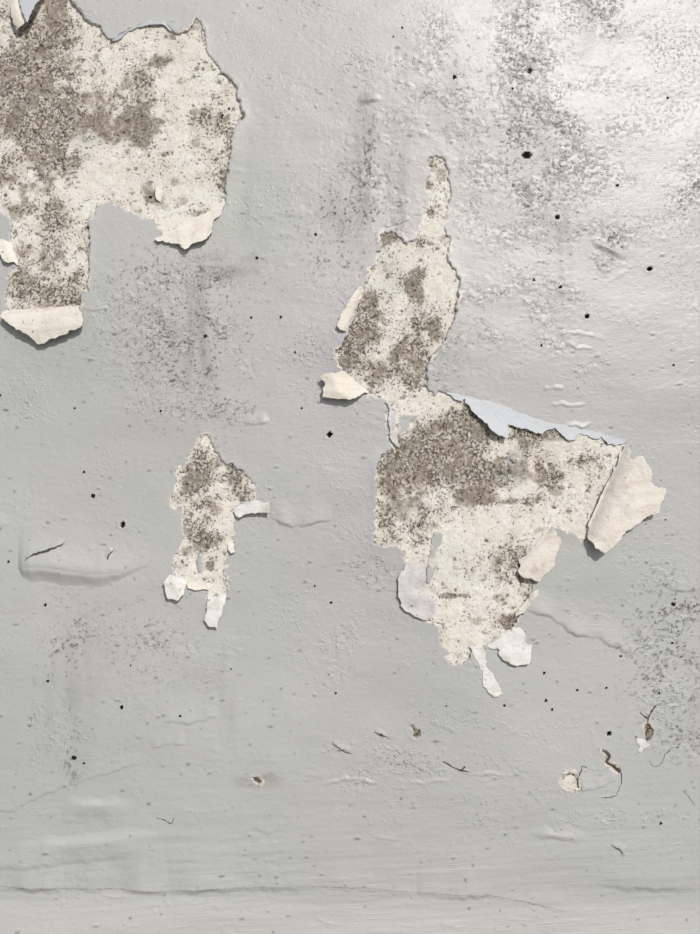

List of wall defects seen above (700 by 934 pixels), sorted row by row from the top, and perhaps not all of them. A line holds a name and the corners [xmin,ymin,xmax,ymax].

peeling [0,0,244,344]
peeling [163,435,270,628]
peeling [320,156,667,697]